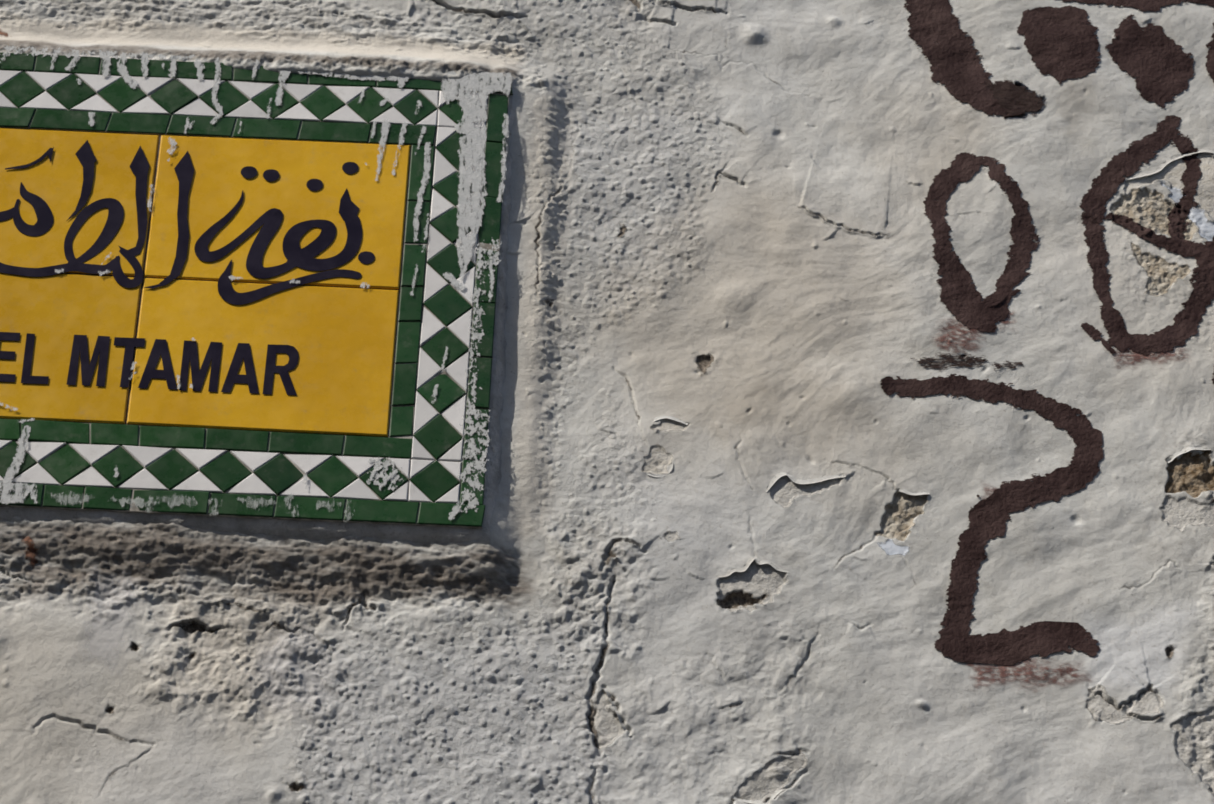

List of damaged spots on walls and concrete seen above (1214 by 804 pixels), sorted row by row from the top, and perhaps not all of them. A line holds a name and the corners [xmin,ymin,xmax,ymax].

peeling [1110,149,1214,241]
peeling [1131,243,1190,296]
peeling [875,489,930,556]
spalling [1159,447,1214,532]
spalling [717,555,788,612]
crack [587,541,631,748]